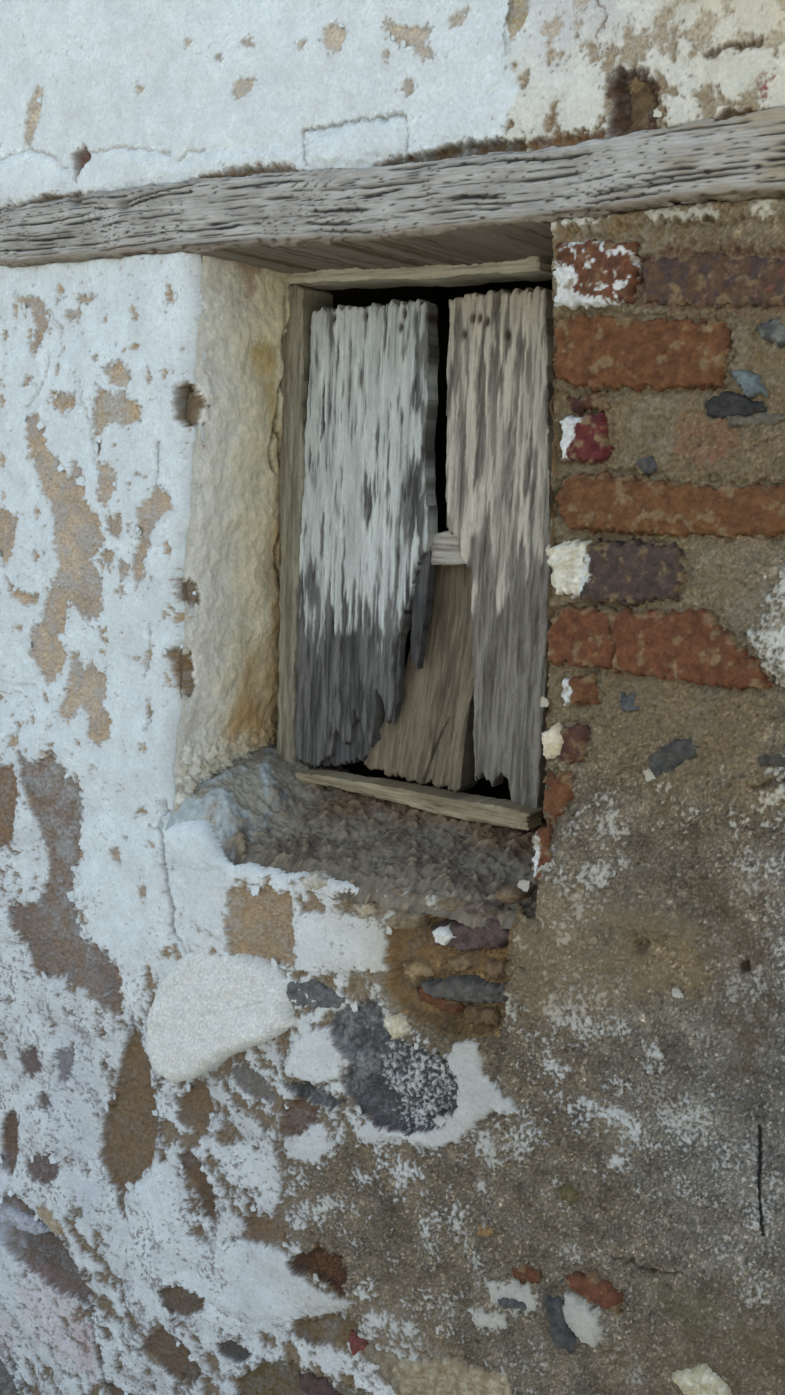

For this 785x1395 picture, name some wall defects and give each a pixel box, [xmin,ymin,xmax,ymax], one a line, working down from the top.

peeling [379,5,472,100]
spalling [368,127,610,167]
crack [593,0,611,46]
peeling [0,357,176,748]
spalling [540,208,785,852]
peeling [0,732,123,1002]
crack [747,775,785,831]
spalling [220,879,530,1143]
spalling [0,1096,96,1318]
peeling [99,1028,220,1222]
peeling [137,1280,207,1391]
spalling [231,1311,374,1395]